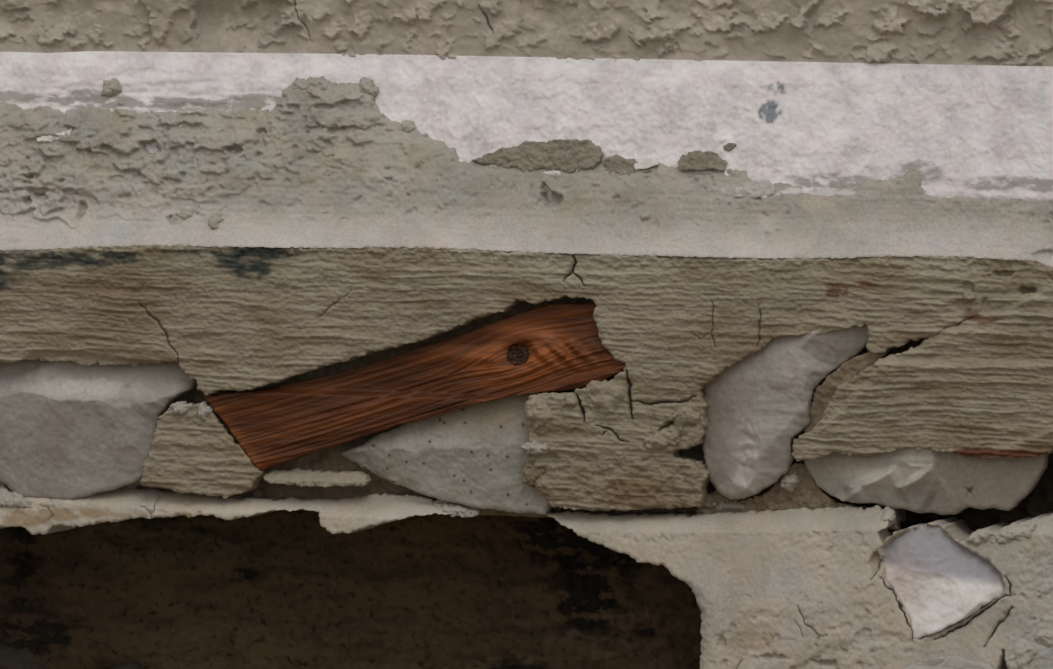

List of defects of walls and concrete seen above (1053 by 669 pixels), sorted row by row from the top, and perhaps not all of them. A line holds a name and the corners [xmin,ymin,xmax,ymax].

spalling [472,139,652,176]
spalling [678,143,737,174]
spalling [171,297,594,404]
spalling [885,338,927,357]
crack [577,371,695,442]
spalling [236,424,439,500]
spalling [679,443,705,461]
spalling [900,453,1053,531]
spalling [480,507,697,521]